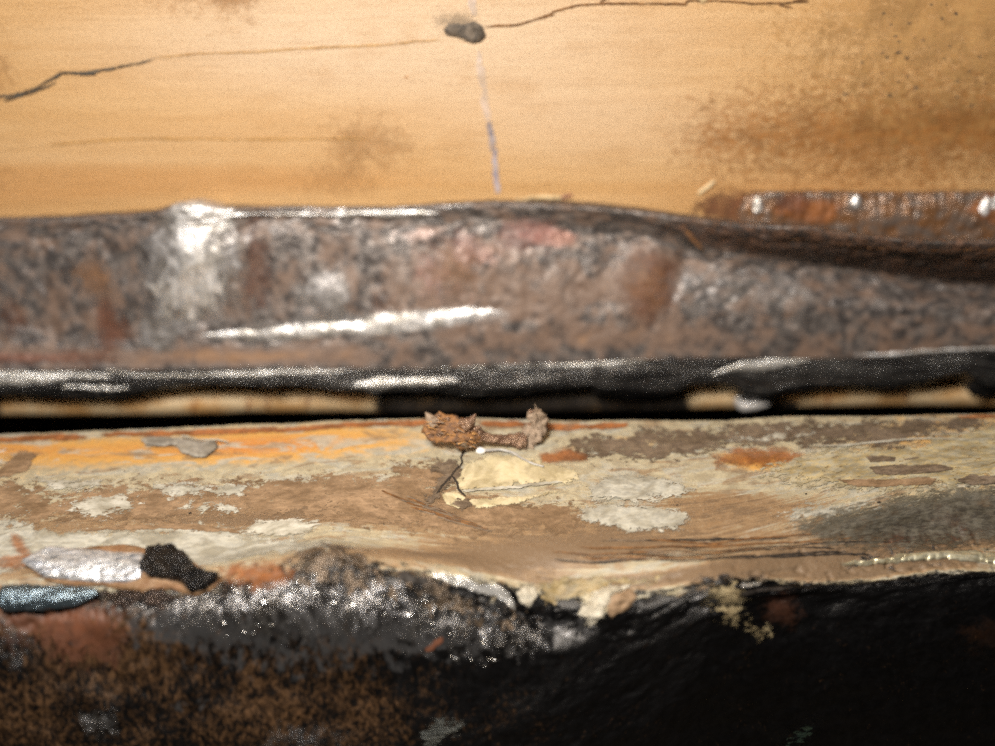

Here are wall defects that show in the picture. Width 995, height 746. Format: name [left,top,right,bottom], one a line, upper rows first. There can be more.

crack [487,0,807,27]
crack [397,38,432,46]
crack [0,45,363,101]
leakage [669,24,995,190]
peeling [0,416,995,668]